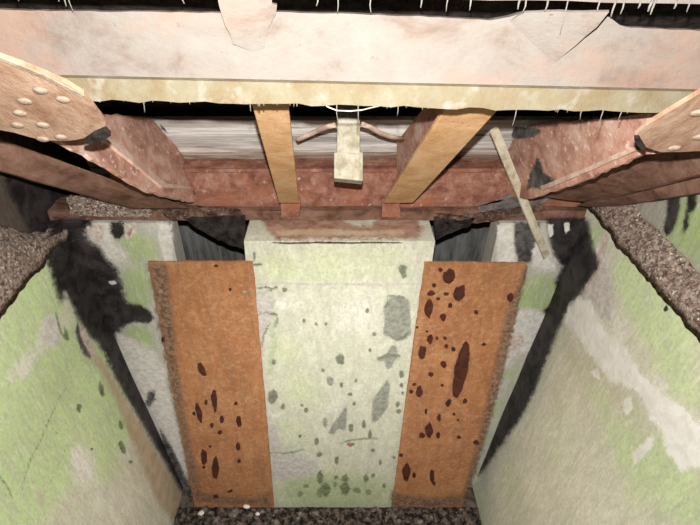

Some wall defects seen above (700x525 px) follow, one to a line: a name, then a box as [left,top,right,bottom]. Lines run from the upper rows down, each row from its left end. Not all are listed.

rust [261,220,425,243]
leakage [424,268,465,322]
leakage [45,218,183,494]
leakage [416,326,470,421]
leakage [478,217,603,477]
leakage [192,390,224,435]
leakage [419,409,441,439]
leakage [201,445,219,479]
leakage [399,453,416,482]